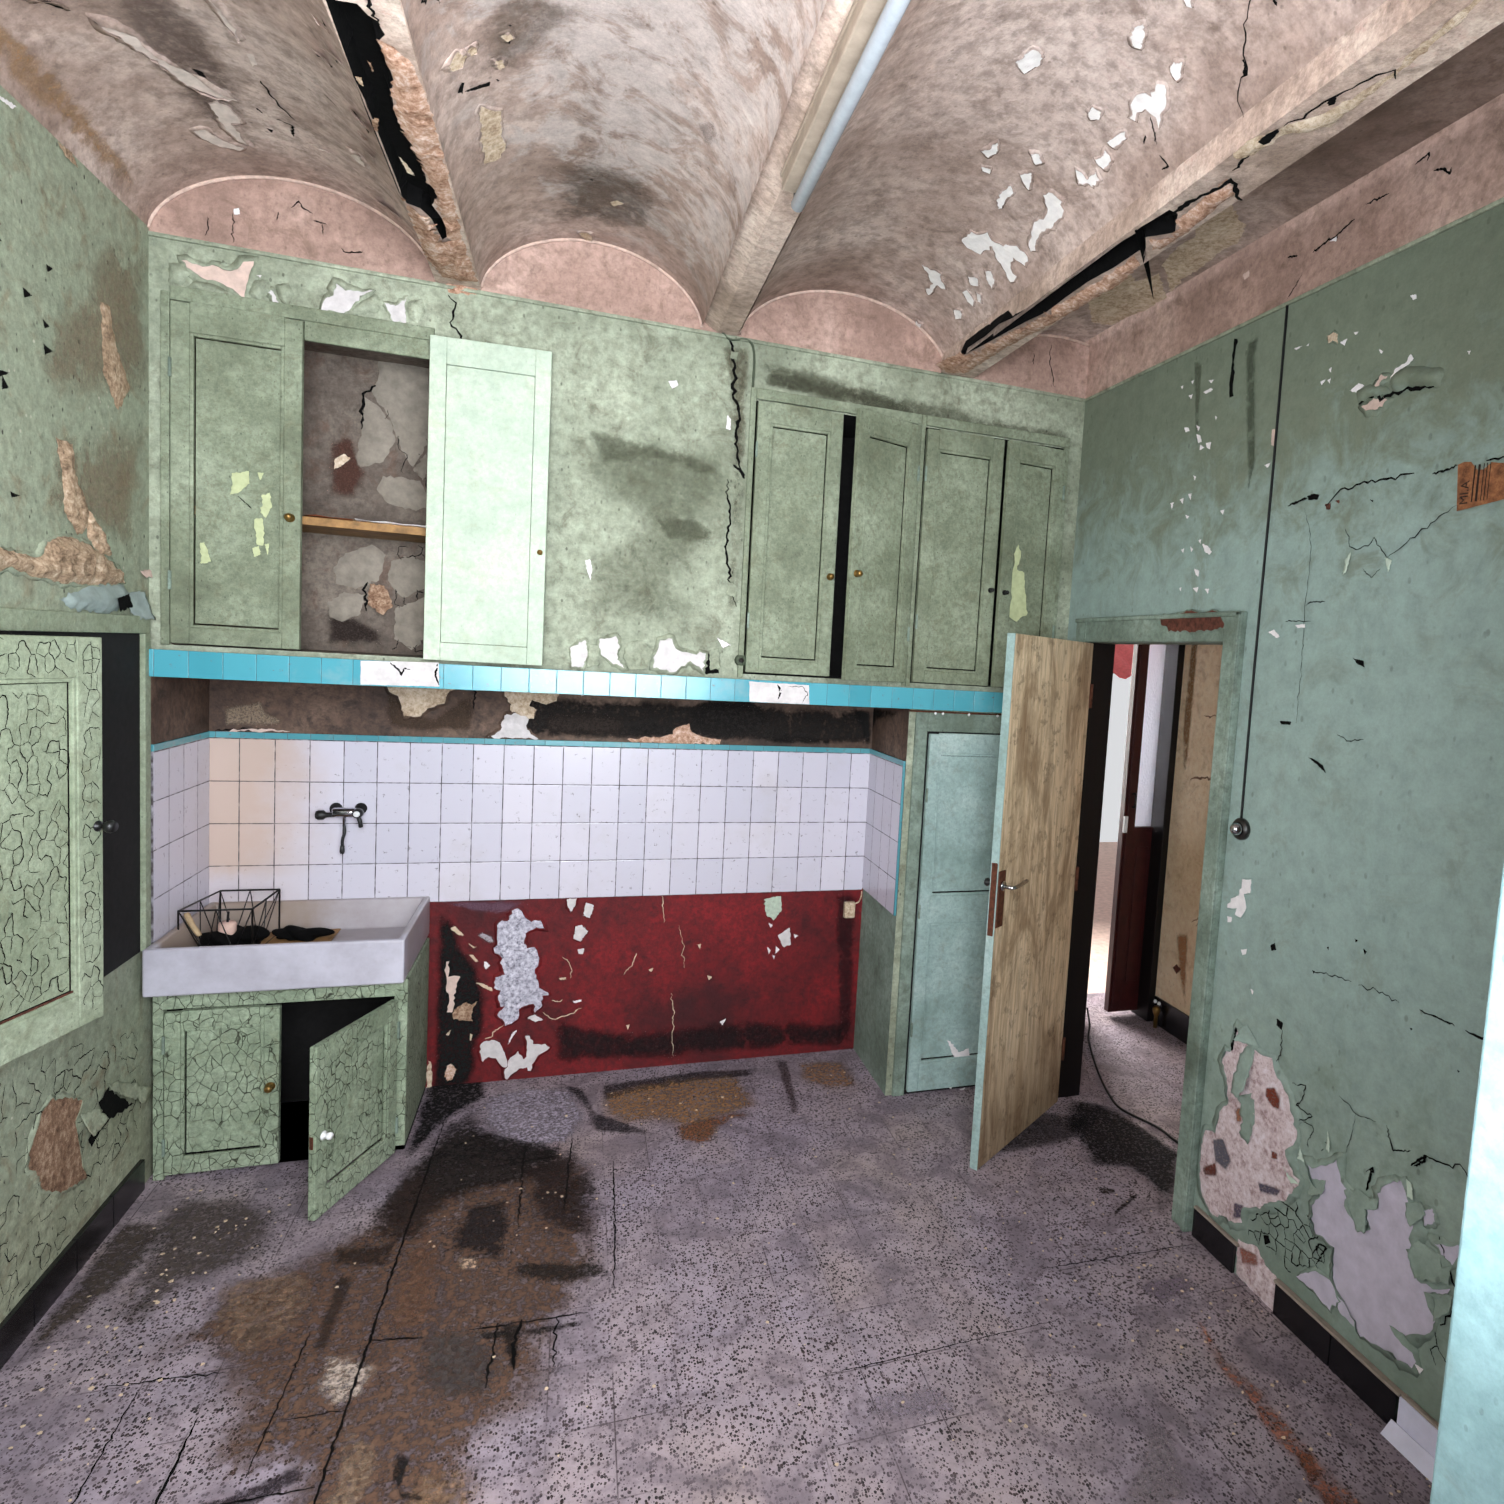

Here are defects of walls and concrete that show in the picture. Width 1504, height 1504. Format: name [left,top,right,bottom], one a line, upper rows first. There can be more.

flaking render [303,0,478,339]
crack [935,0,1481,385]
peeling [332,361,429,511]
peeling [327,545,458,719]
crack [724,341,745,605]
peeling [749,681,809,704]
crack [1269,456,1504,725]
peeling [445,898,594,1080]
crack [72,1372,224,1504]
crack [222,1113,447,1504]
corrosion [1203,1329,1358,1504]
peeling [1196,1019,1460,1378]